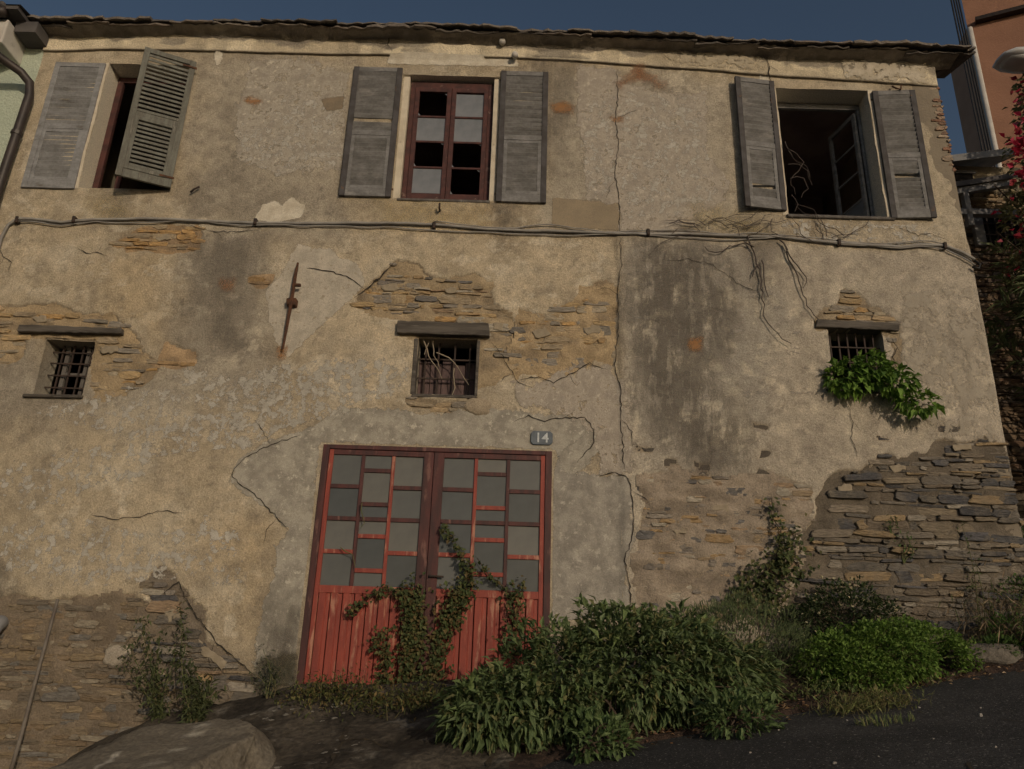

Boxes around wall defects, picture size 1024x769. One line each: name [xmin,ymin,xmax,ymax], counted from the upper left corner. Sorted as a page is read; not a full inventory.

flaking render [109,224,206,254]
flaking render [0,303,468,456]
flaking render [248,274,275,289]
crack [231,420,296,540]
crack [492,71,650,603]
flaking render [349,261,1024,644]
flaking render [0,566,263,769]